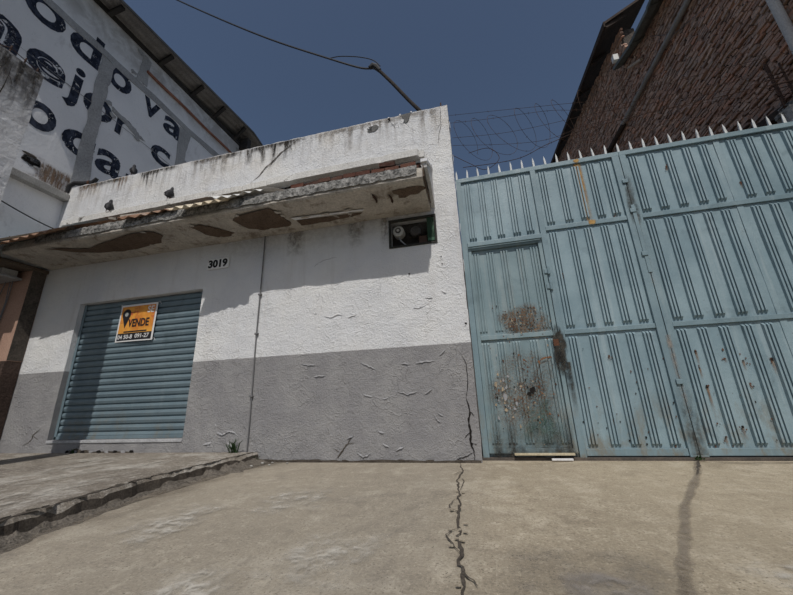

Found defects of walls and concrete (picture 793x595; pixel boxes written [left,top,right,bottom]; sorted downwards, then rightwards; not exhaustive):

water stain [195,138,298,163]
spalling [389,163,431,203]
rust [573,159,595,224]
spalling [190,208,364,239]
spalling [50,232,163,254]
rust [492,305,551,343]
crack [445,350,477,595]